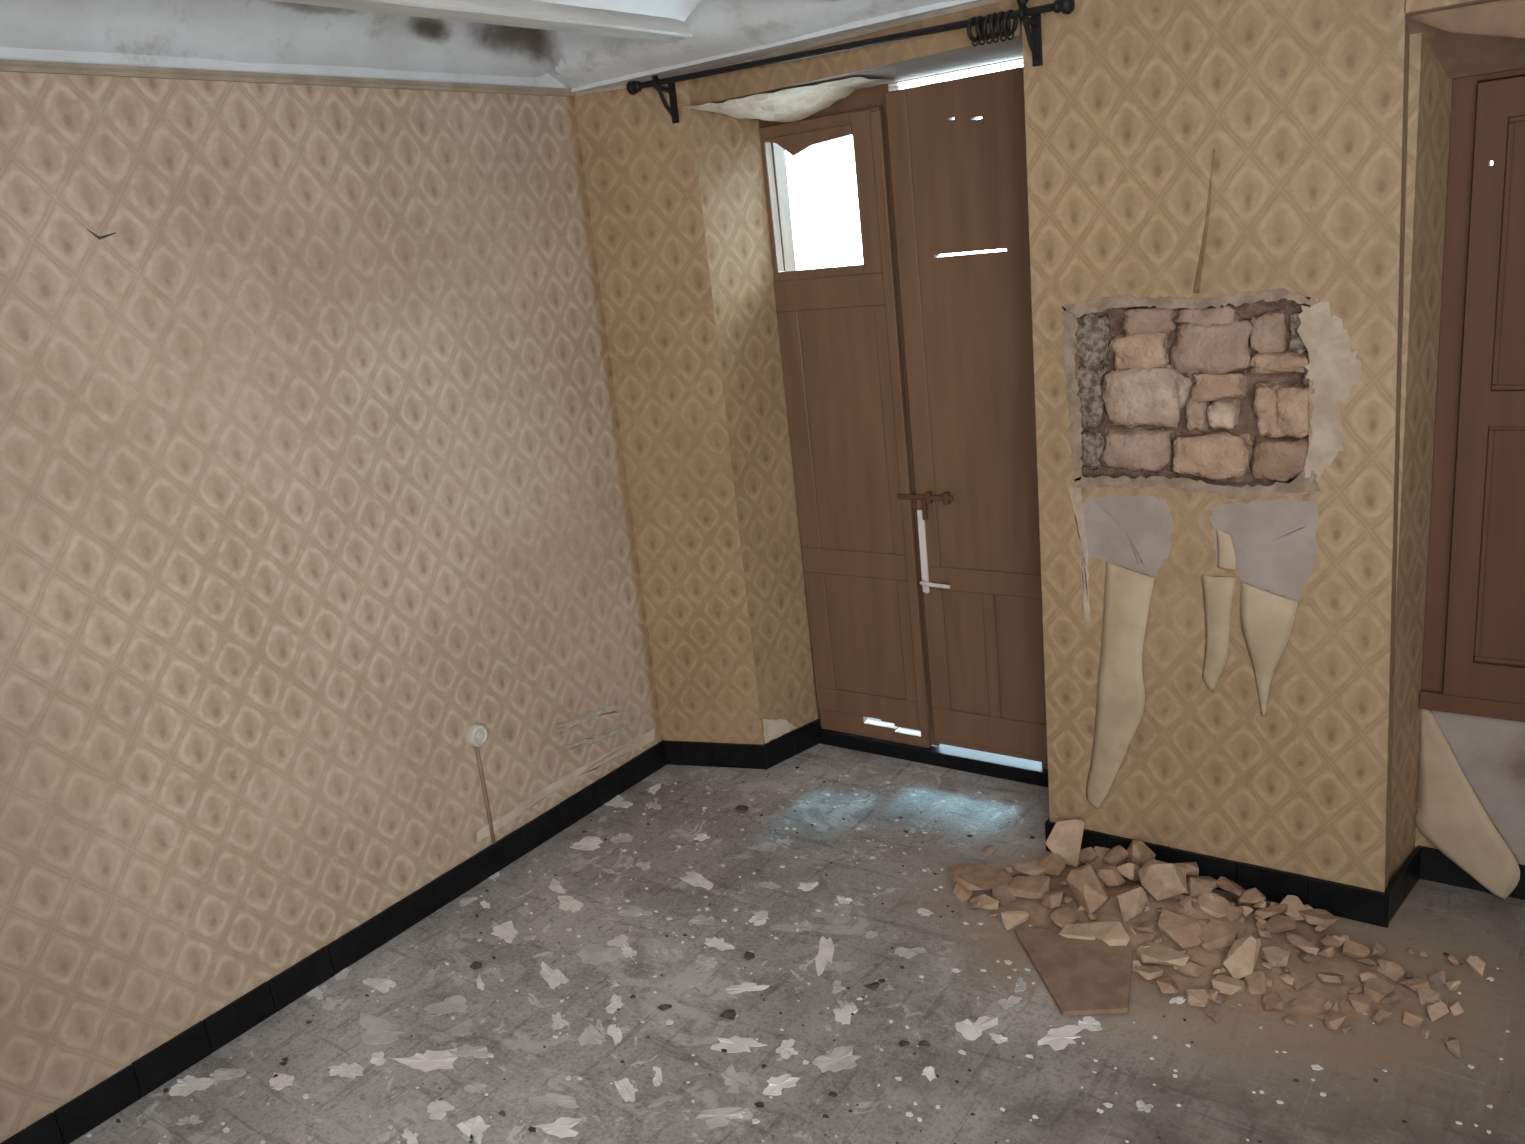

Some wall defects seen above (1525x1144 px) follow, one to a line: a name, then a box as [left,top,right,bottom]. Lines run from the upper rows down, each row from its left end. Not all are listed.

damp [414,19,444,38]
damp [483,25,550,58]
flaking render [1061,288,1363,601]
flaking render [1430,710,1525,865]